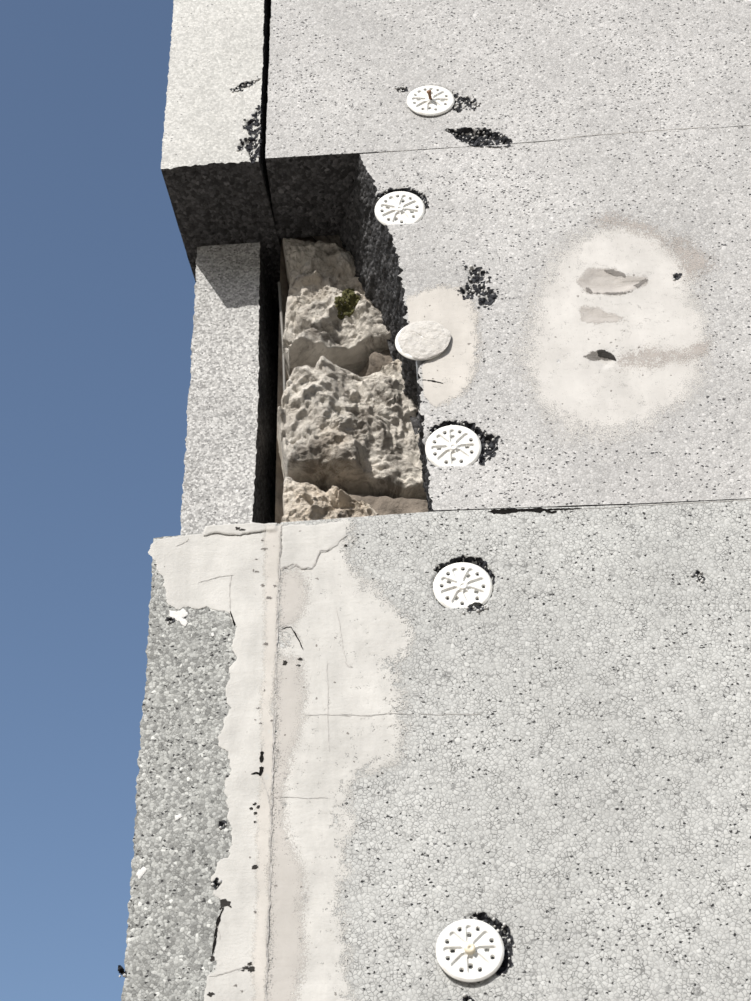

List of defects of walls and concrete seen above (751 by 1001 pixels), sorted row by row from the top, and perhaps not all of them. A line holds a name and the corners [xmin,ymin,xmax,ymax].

spalling [376,187,429,210]